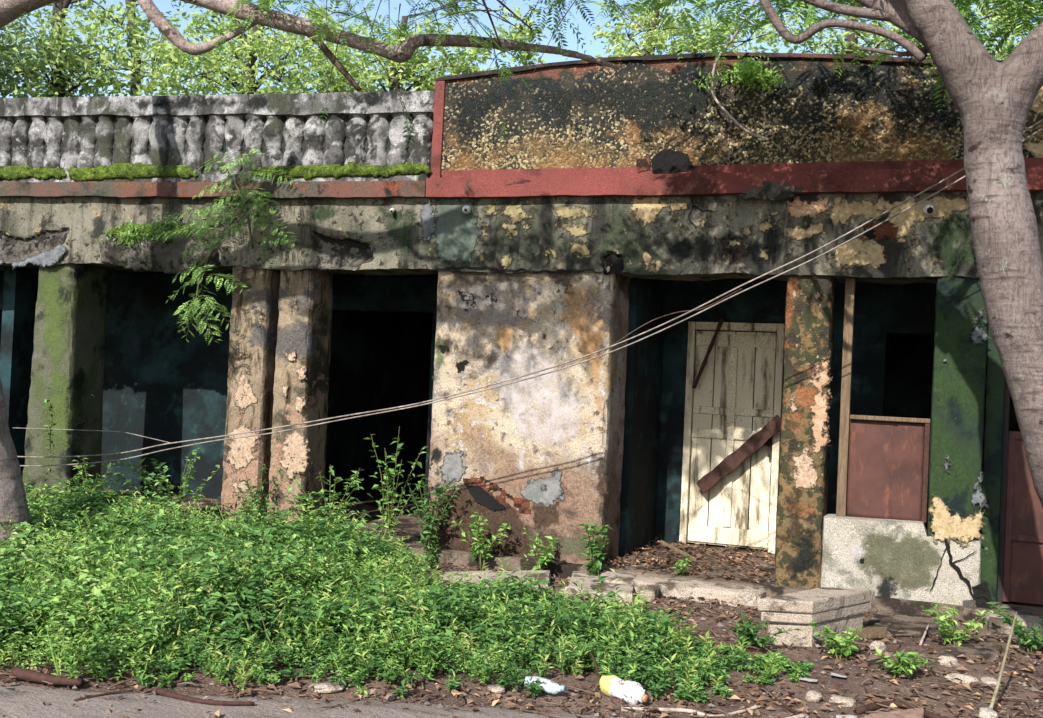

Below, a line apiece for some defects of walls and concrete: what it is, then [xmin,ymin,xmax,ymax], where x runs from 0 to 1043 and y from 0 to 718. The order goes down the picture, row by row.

leakage [542,82,706,149]
leakage [802,80,954,143]
peeling [626,197,707,231]
peeling [718,182,968,272]
leakage [47,372,67,442]
peeling [277,429,310,483]
spalling [439,449,531,514]
peeling [789,355,833,490]
rust [846,419,925,521]
spalling [928,471,990,549]
mould [855,533,941,598]
crack [929,517,979,608]